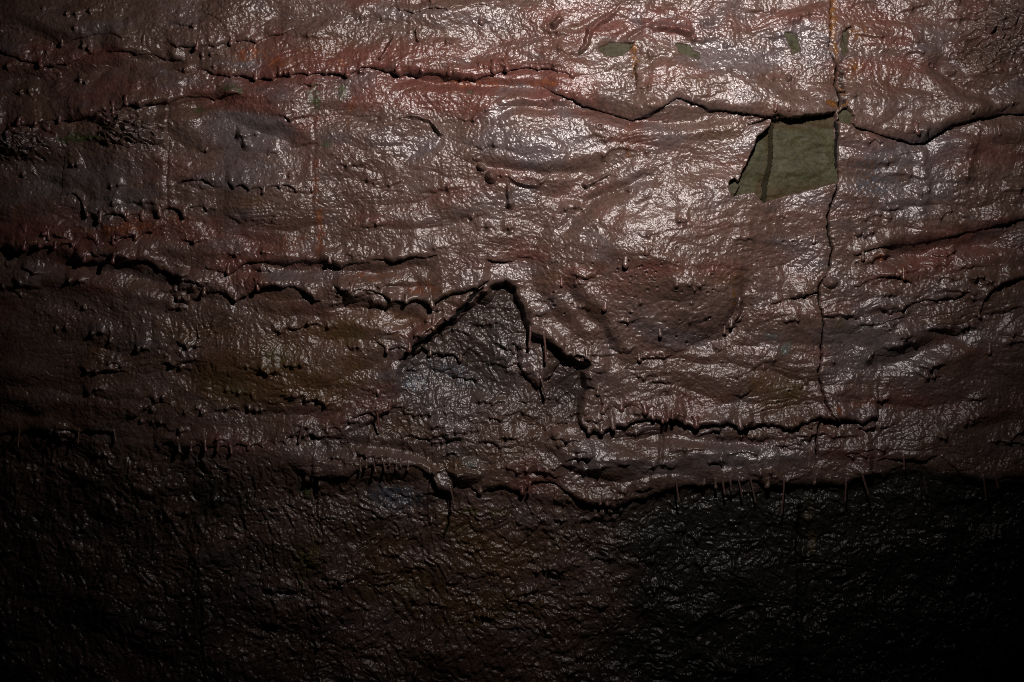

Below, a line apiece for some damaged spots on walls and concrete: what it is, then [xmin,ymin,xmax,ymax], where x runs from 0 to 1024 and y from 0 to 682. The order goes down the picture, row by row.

spalling [599,42,633,57]
spalling [676,44,699,59]
spalling [785,33,800,54]
spalling [729,109,852,203]
crack [748,9,853,454]
crack [400,288,483,361]